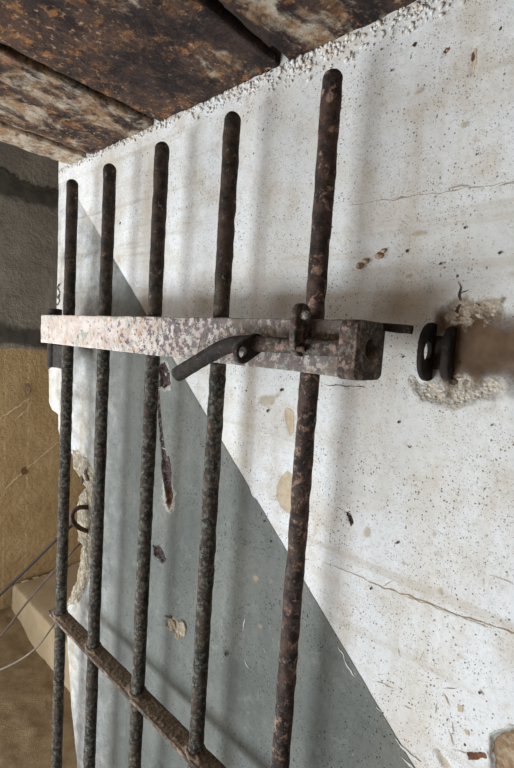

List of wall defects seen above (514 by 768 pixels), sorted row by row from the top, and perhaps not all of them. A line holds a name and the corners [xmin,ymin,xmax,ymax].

flaking render [59,0,480,174]
crack [353,181,514,205]
spalling [444,298,505,327]
spalling [408,374,510,410]
spalling [67,449,93,606]
crack [323,562,514,634]
spalling [164,615,186,639]
spalling [467,725,514,768]